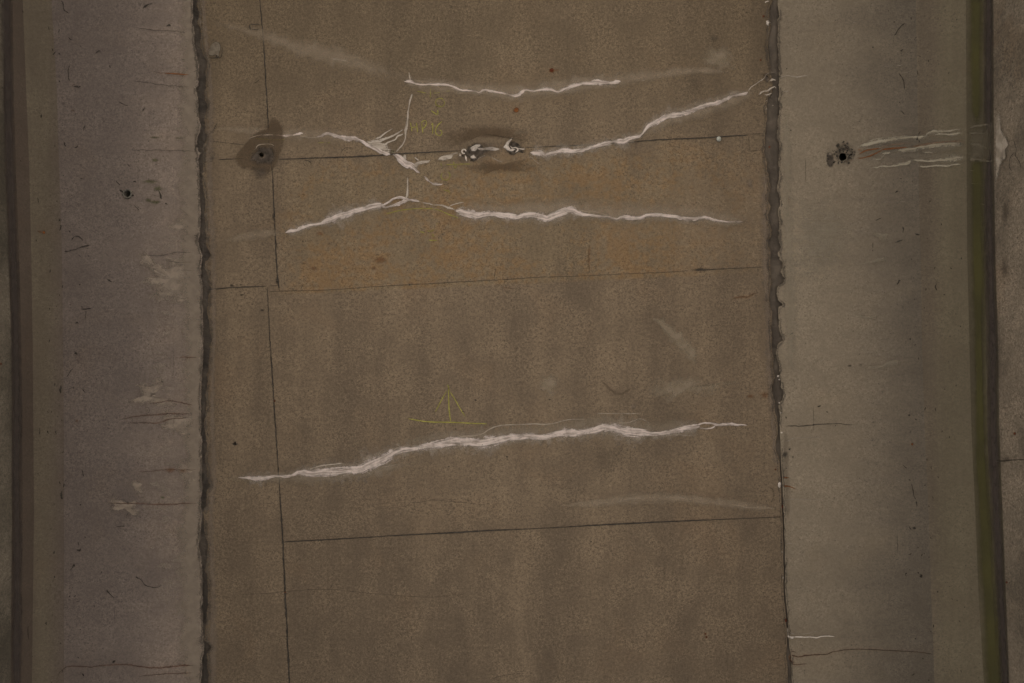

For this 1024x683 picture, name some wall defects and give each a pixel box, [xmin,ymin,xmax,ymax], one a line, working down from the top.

damp [230,49,742,239]